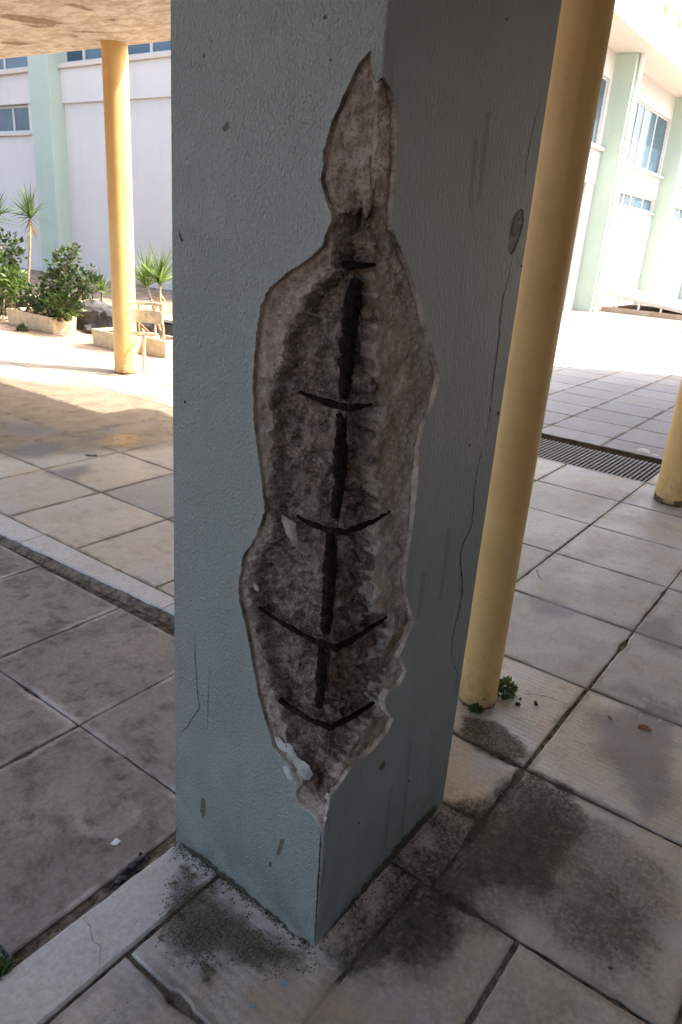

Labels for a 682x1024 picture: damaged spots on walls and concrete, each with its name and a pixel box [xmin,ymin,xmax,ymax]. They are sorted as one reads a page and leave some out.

spalling [238,51,440,828]
crack [452,260,512,696]
water stain [181,844,286,926]
water stain [324,772,586,972]